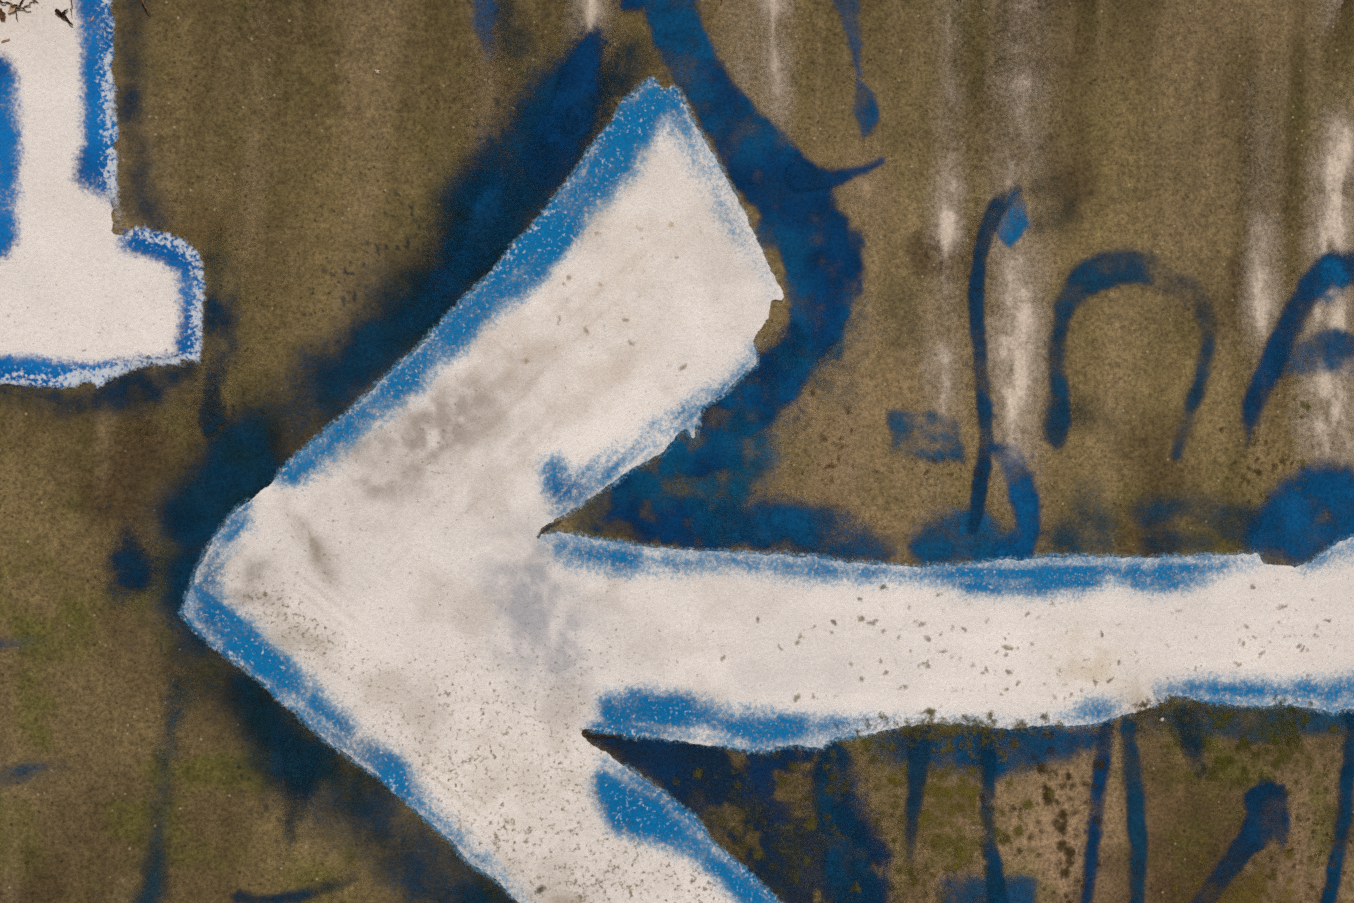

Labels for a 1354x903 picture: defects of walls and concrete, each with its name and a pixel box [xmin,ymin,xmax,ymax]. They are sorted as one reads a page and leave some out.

water stain [580,0,604,33]
water stain [761,0,788,107]
water stain [934,167,963,256]
water stain [1308,115,1354,260]
water stain [1247,219,1279,339]
water stain [927,345,952,415]
water stain [987,220,1044,467]
water stain [1298,282,1354,464]